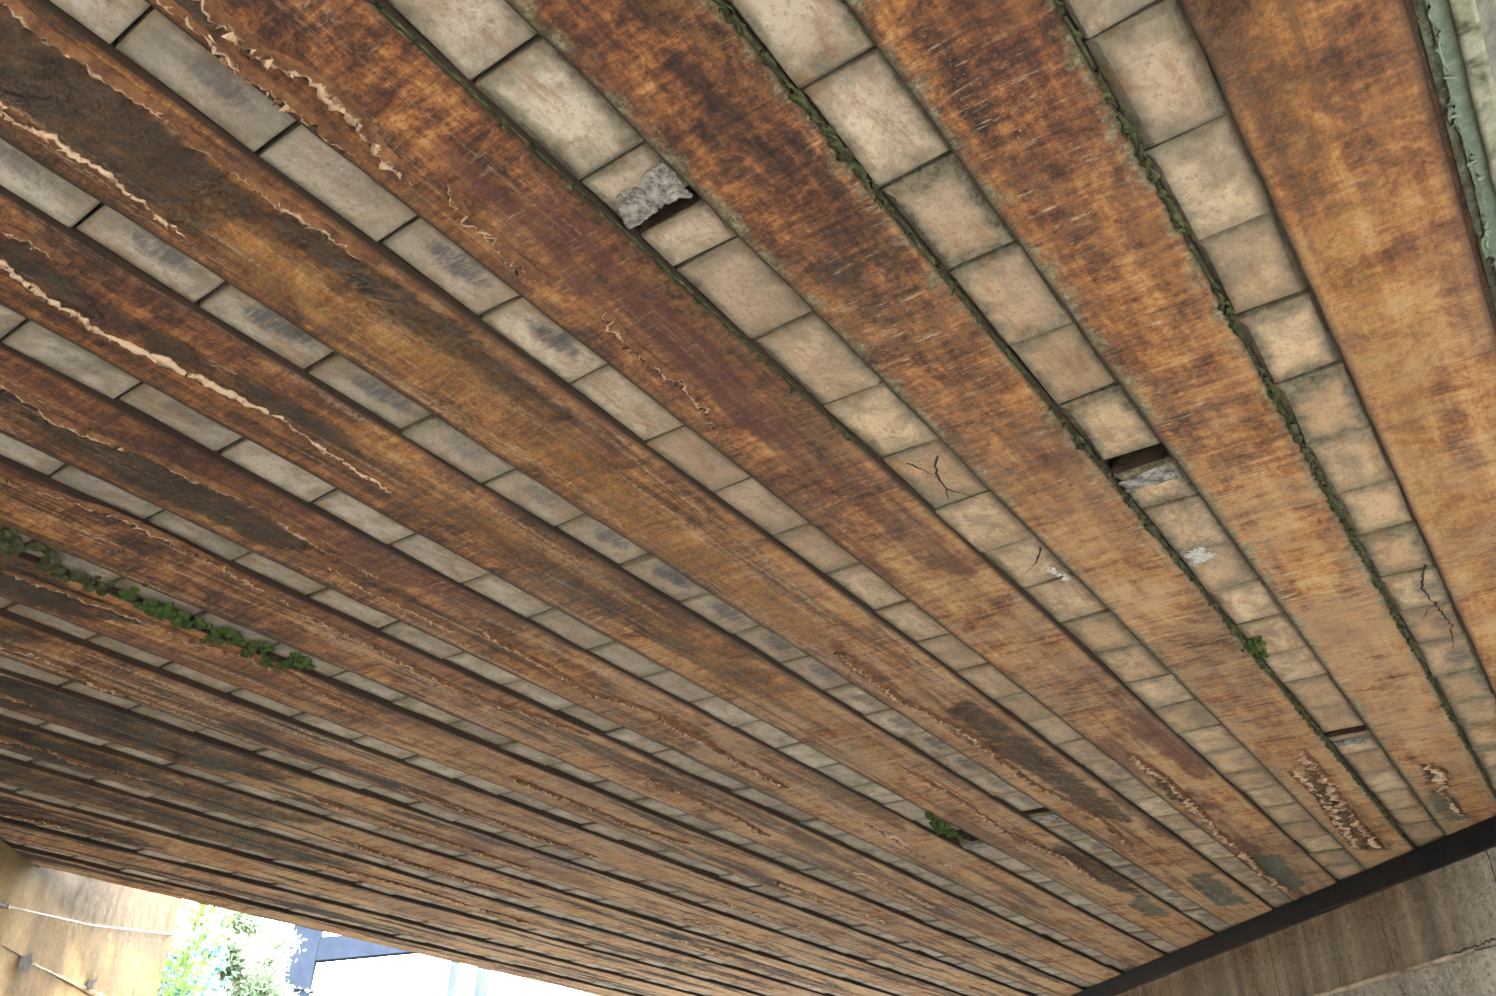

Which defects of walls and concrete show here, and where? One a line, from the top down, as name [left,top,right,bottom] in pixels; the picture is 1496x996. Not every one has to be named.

spalling [614,163,700,232]
spalling [1111,442,1177,493]